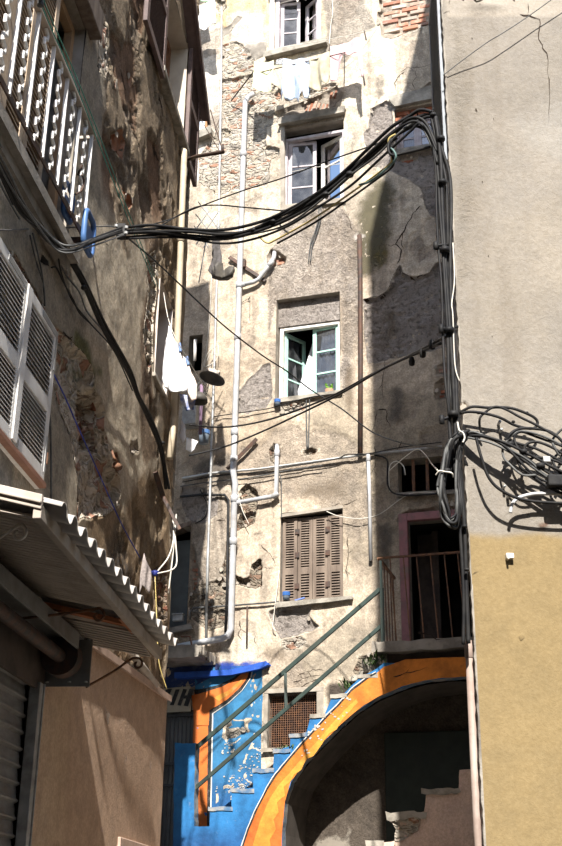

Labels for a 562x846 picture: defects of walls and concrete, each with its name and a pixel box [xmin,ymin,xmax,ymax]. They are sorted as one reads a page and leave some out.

flaking render [377,0,430,39]
crack [520,5,550,123]
flaking render [363,101,435,217]
leakage [355,180,397,289]
crack [364,205,425,302]
flaking render [363,260,457,363]
spalling [75,395,96,454]
flaking render [268,606,319,639]
flaking render [221,723,247,754]
peeling [223,747,261,800]